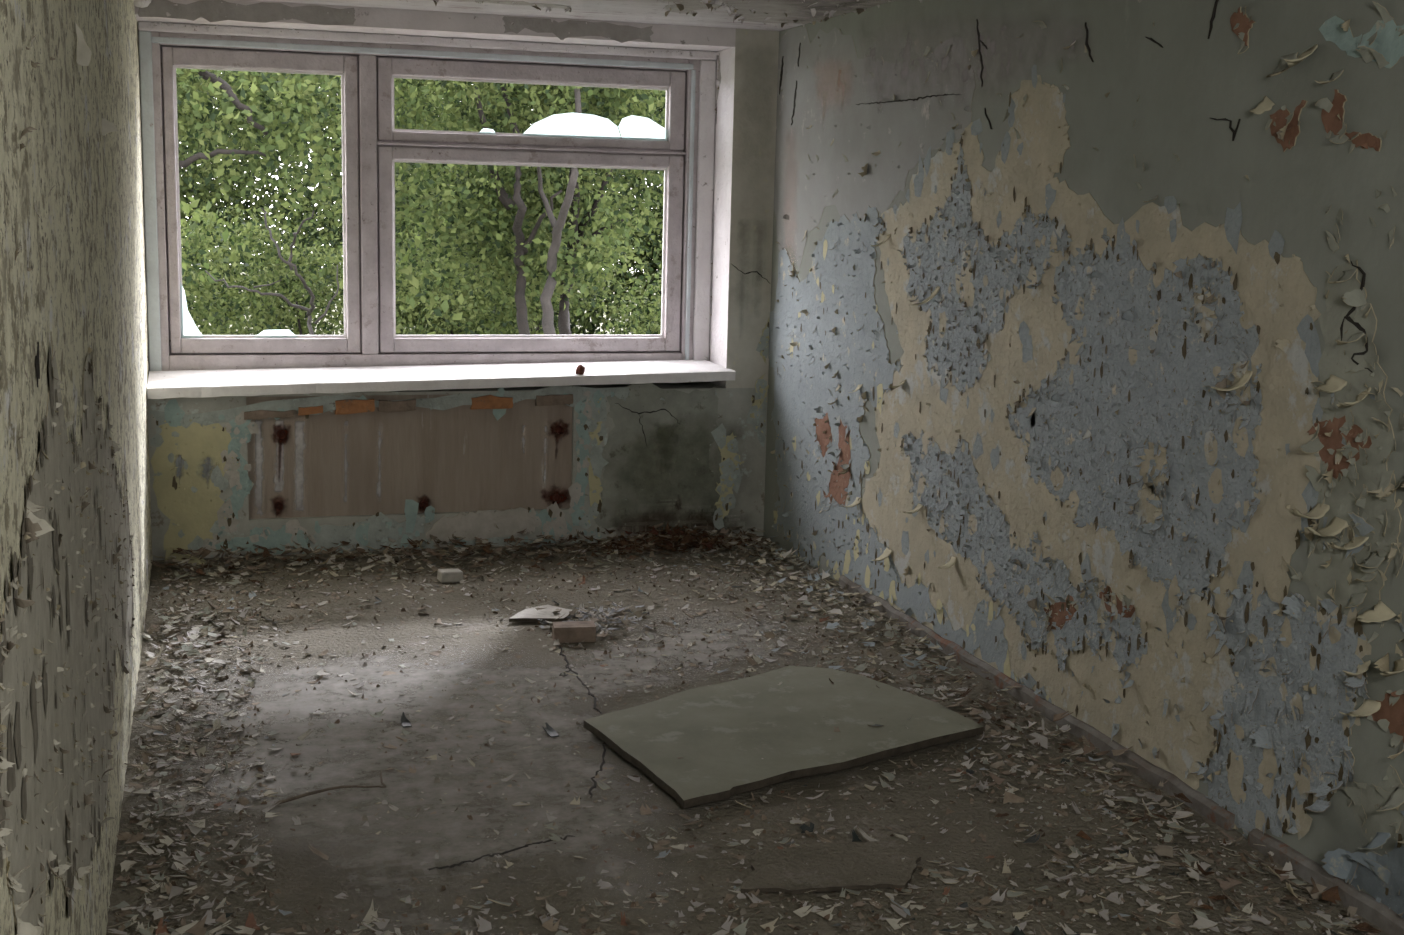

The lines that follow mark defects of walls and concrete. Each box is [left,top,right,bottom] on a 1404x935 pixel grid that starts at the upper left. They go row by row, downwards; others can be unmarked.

peeling [75,21,92,66]
flaking render [138,0,367,38]
flaking render [427,0,693,56]
rust [273,424,289,478]
flaking render [149,383,744,557]
rust [542,486,569,506]
peeling [655,0,1404,918]
peeling [0,342,135,935]
peeling [545,898,559,917]